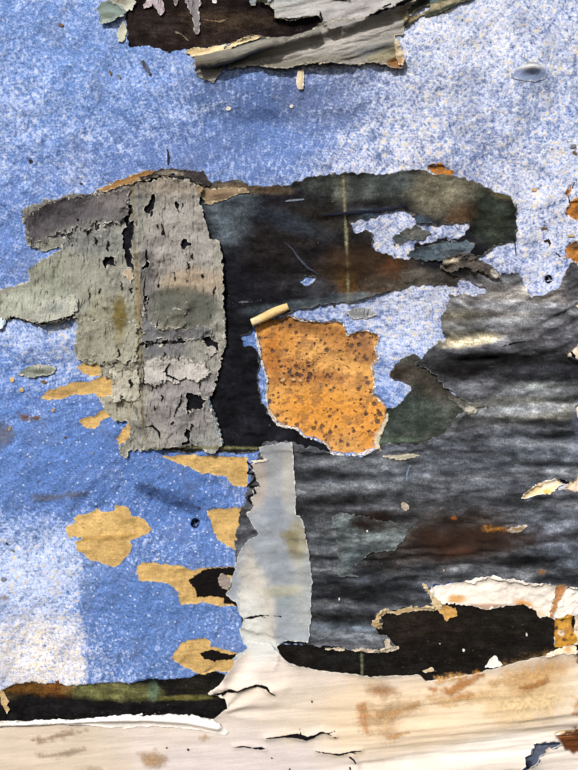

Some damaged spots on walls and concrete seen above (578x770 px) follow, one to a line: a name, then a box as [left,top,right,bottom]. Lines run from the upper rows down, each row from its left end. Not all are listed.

flaking render [428,162,454,175]
flaking render [565,186,578,221]
flaking render [564,241,578,263]
flaking render [255,315,386,456]
peeling [521,478,563,499]
peeling [218,573,231,590]
peeling [430,575,578,647]
peeling [485,655,502,668]